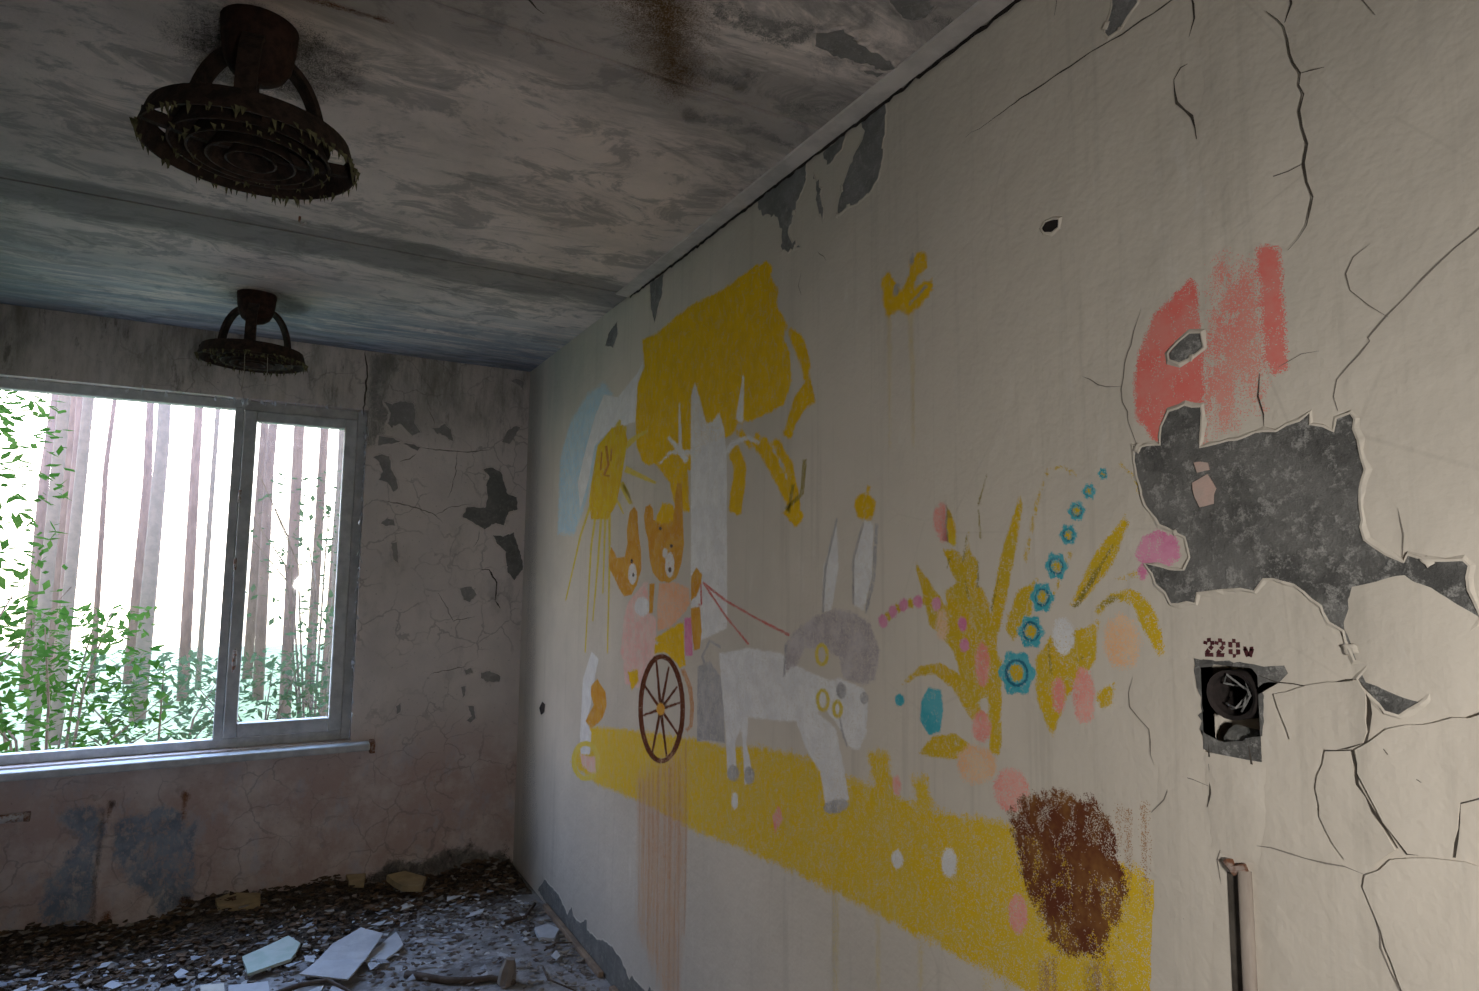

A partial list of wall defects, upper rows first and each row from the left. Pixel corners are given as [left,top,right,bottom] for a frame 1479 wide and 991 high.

leakage [601,0,823,151]
peeling [757,97,889,254]
crack [966,0,1197,139]
crack [1266,0,1323,250]
peeling [372,399,455,494]
crack [383,413,500,621]
peeling [461,465,524,582]
crack [1082,310,1141,442]
crack [1257,228,1479,424]
peeling [459,666,502,725]
flaking render [1131,400,1479,991]
peeling [535,878,657,991]